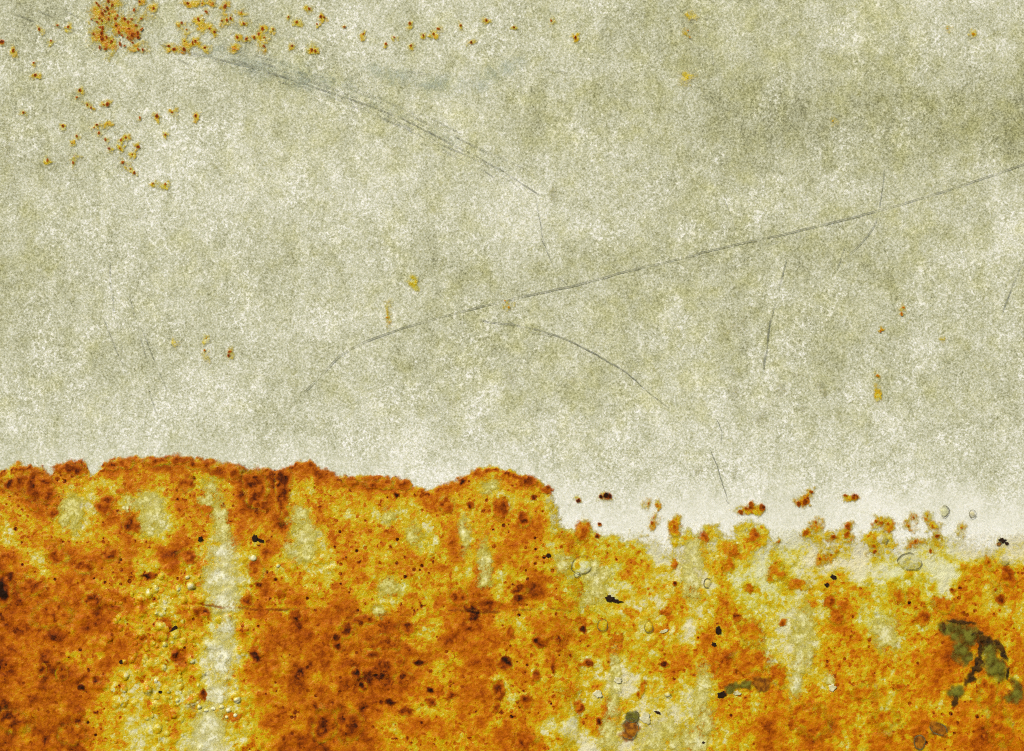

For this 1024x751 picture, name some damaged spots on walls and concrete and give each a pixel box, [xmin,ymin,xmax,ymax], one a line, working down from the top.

corrosion [37,22,73,46]
corrosion [90,0,159,56]
corrosion [162,0,276,54]
corrosion [288,41,320,54]
corrosion [287,4,329,28]
corrosion [383,21,443,50]
corrosion [75,86,113,110]
corrosion [139,107,178,139]
corrosion [59,124,81,165]
corrosion [91,120,140,176]
corrosion [0,454,1024,751]